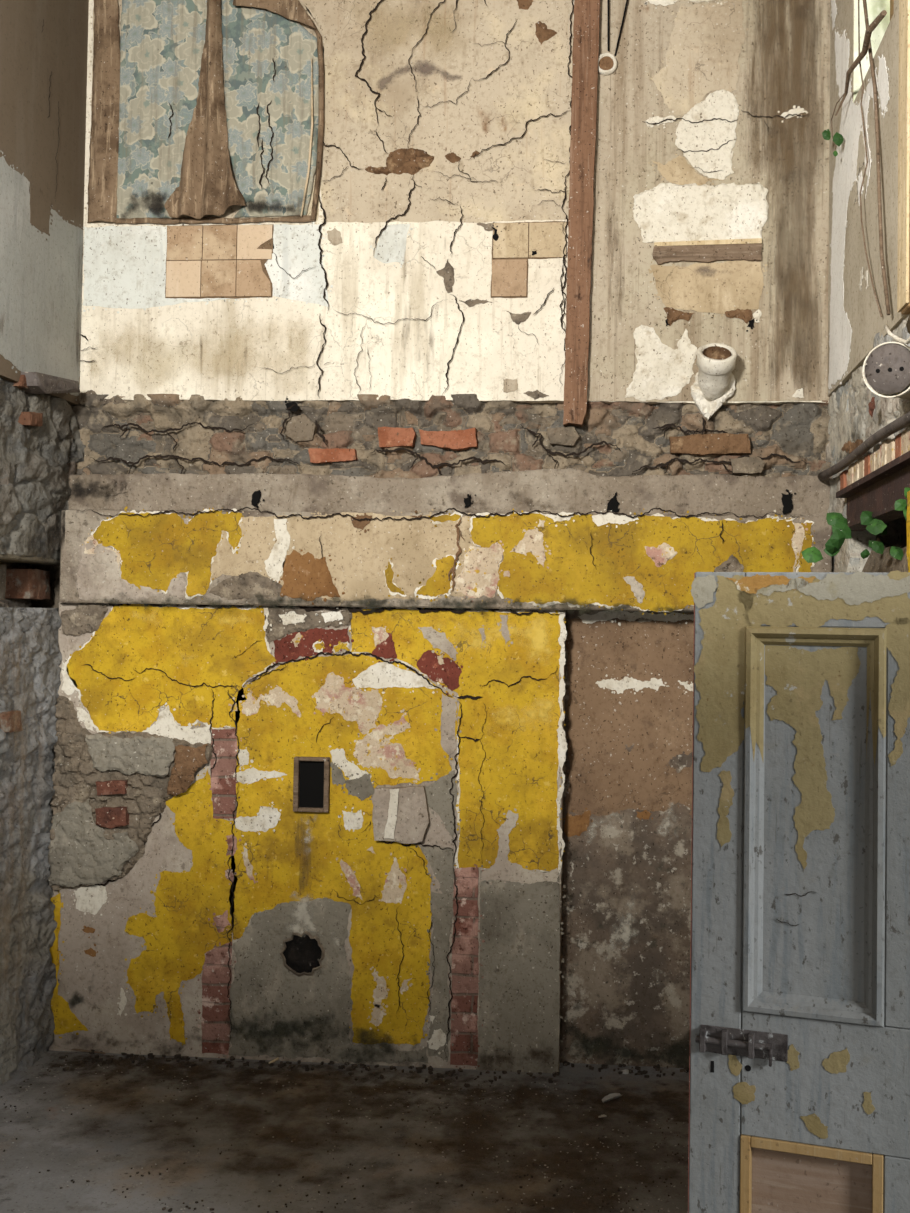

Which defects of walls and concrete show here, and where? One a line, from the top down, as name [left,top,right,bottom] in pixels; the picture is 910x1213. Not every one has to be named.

peeling [151,0,574,246]
crack [262,0,574,444]
peeling [648,154,724,185]
peeling [645,0,749,129]
peeling [648,259,768,326]
leakage [770,0,817,384]
peeling [828,0,889,389]
flaking render [5,569,50,600]
crack [85,640,558,1060]
peeling [48,507,815,1069]
leakage [570,1026,690,1068]